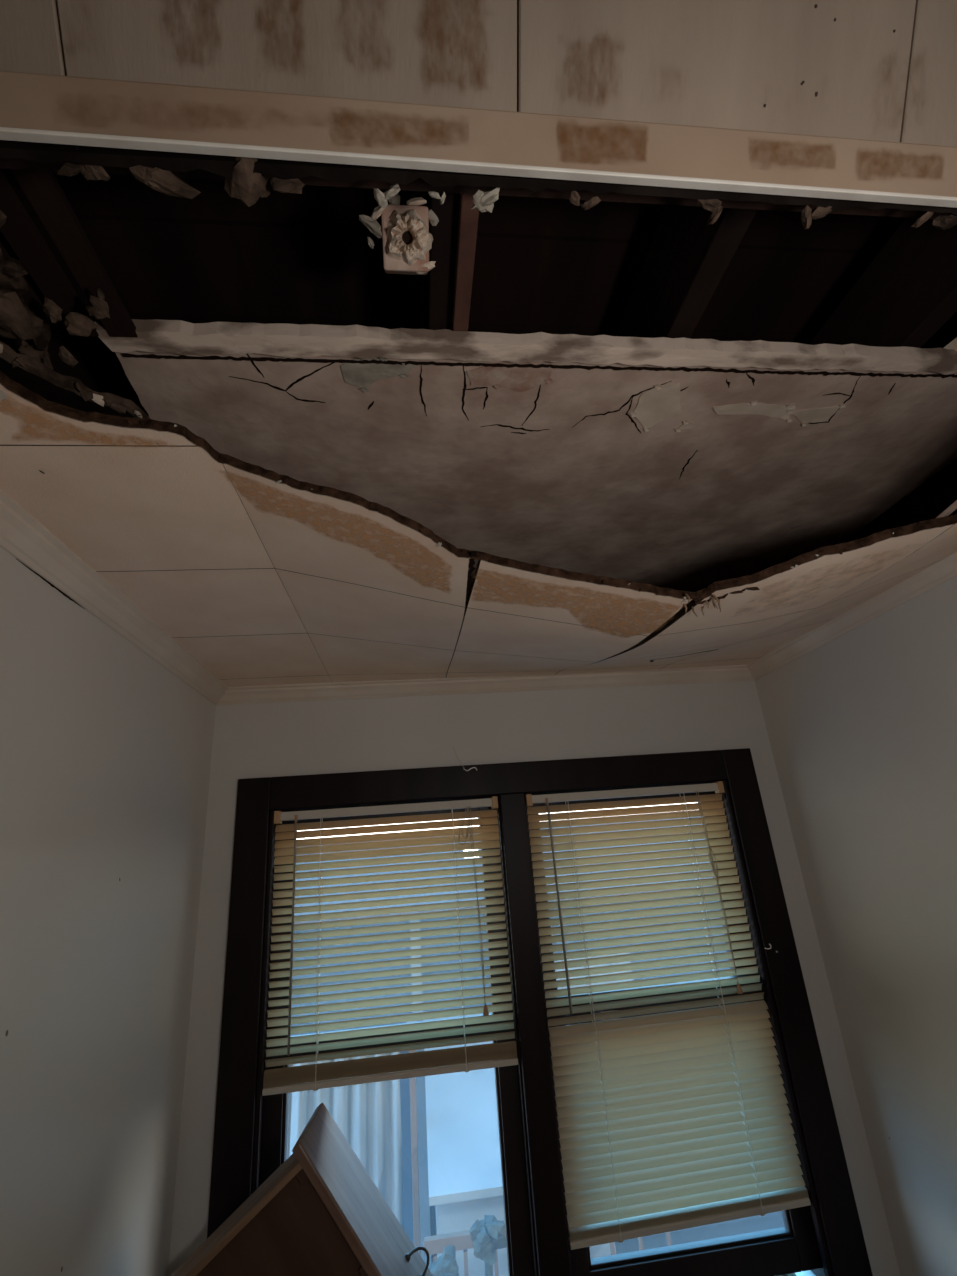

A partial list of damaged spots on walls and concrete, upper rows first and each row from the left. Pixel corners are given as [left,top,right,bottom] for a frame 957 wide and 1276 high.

spalling [0,140,957,432]
crack [229,354,333,403]
crack [419,365,427,416]
crack [462,366,688,434]
crack [465,551,477,604]
peeling [683,579,760,604]
crack [634,603,718,662]